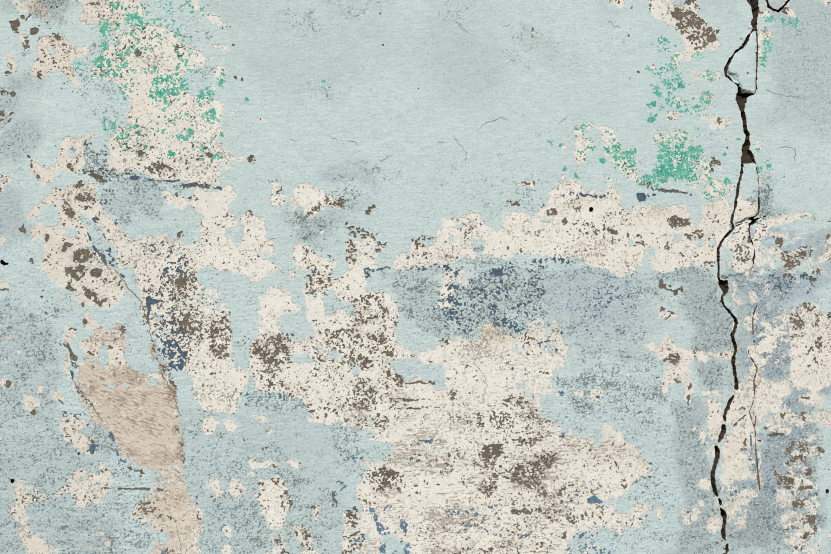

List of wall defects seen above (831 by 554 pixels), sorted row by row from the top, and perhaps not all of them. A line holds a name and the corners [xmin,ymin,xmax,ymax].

crack [734,0,754,53]
crack [735,95,747,109]
crack [741,145,752,164]
peeling [578,282,681,335]
crack [717,281,725,293]
peeling [0,368,64,429]
peeling [617,210,831,554]
crack [733,307,760,488]
peeling [205,456,333,554]